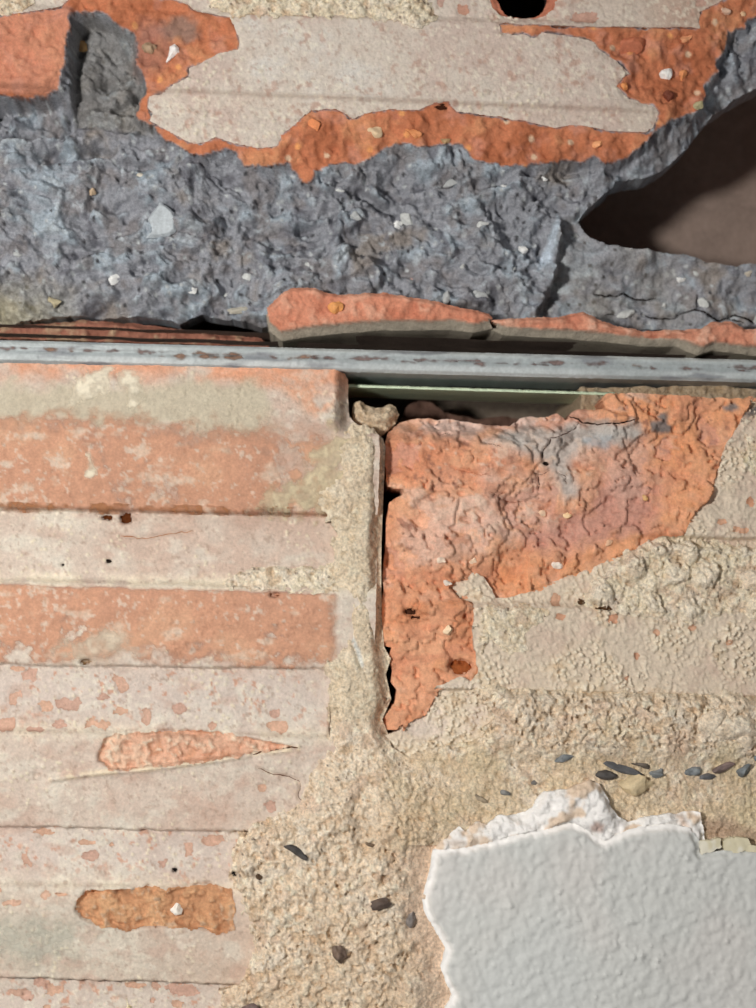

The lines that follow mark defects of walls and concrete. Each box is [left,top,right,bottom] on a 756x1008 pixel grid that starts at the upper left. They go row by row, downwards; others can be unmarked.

spalling [0,0,756,360]
crack [594,293,753,331]
spalling [381,393,756,731]
peeling [0,584,335,733]
spalling [85,706,291,771]
peeling [258,784,276,813]
flaking render [435,761,756,855]
peeling [78,839,99,861]
peeling [185,834,225,857]
spalling [40,883,236,935]